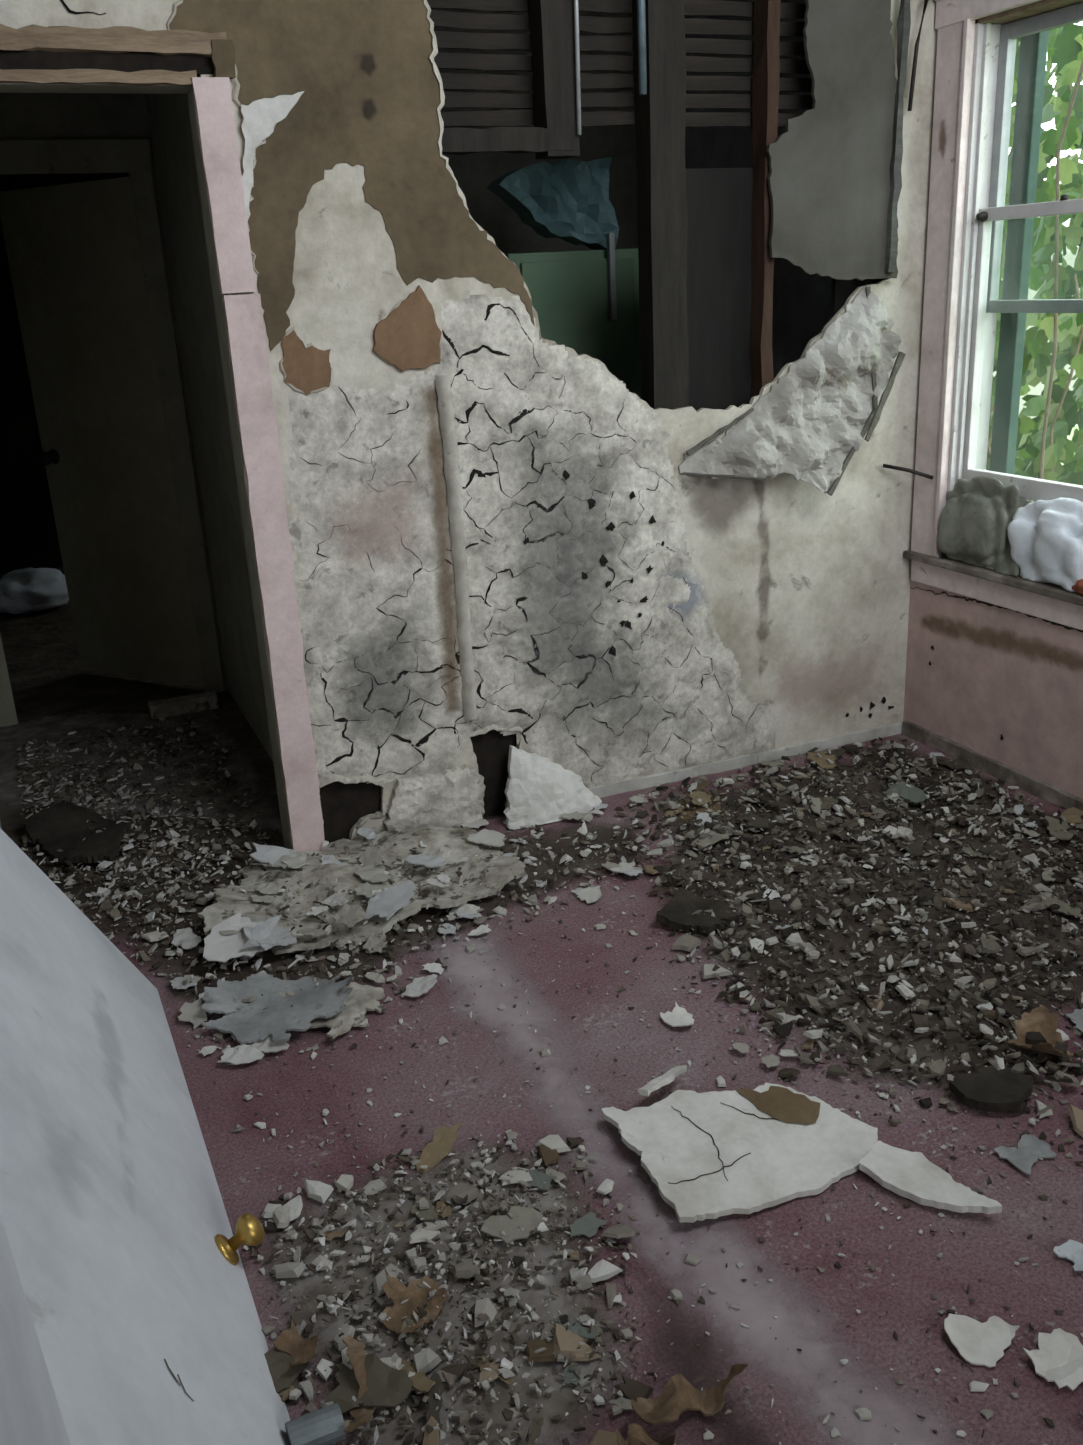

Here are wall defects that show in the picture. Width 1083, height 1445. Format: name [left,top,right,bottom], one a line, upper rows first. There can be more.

crack [61,0,106,15]
flaking render [166,0,535,396]
leakage [696,477,770,639]
crack [910,587,1083,632]
spalling [319,773,388,844]
spalling [460,725,523,828]
flaking render [503,825,537,856]